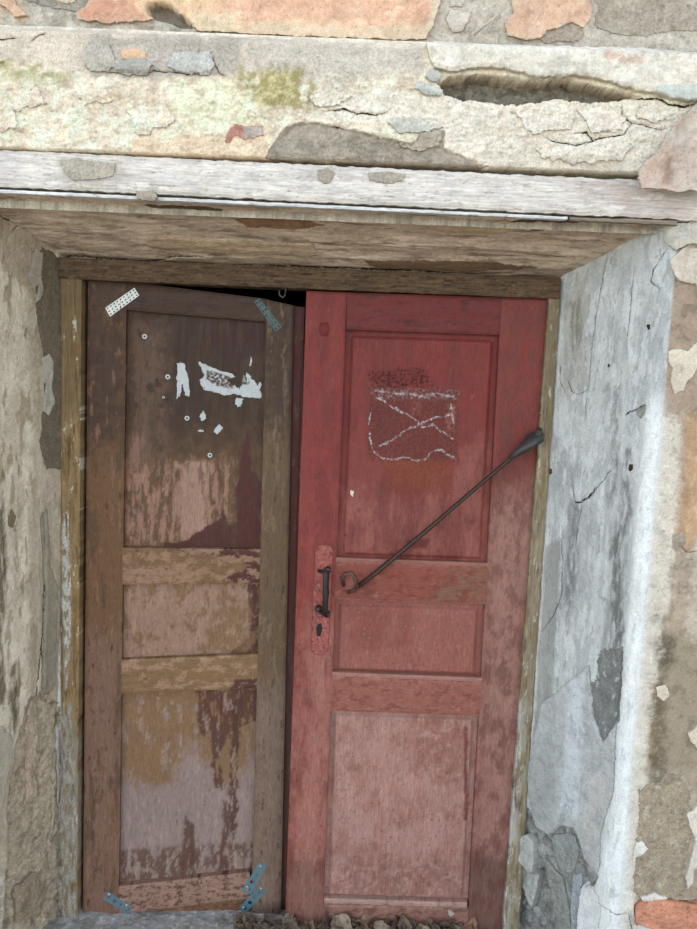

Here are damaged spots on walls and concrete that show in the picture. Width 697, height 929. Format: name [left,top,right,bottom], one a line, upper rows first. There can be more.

peeling [0,0,471,41]
spalling [504,0,697,44]
peeling [442,82,697,193]
peeling [662,221,697,291]
peeling [668,342,697,394]
crack [545,467,614,627]
damp [0,507,18,729]
peeling [518,646,624,929]
spalling [632,770,697,929]